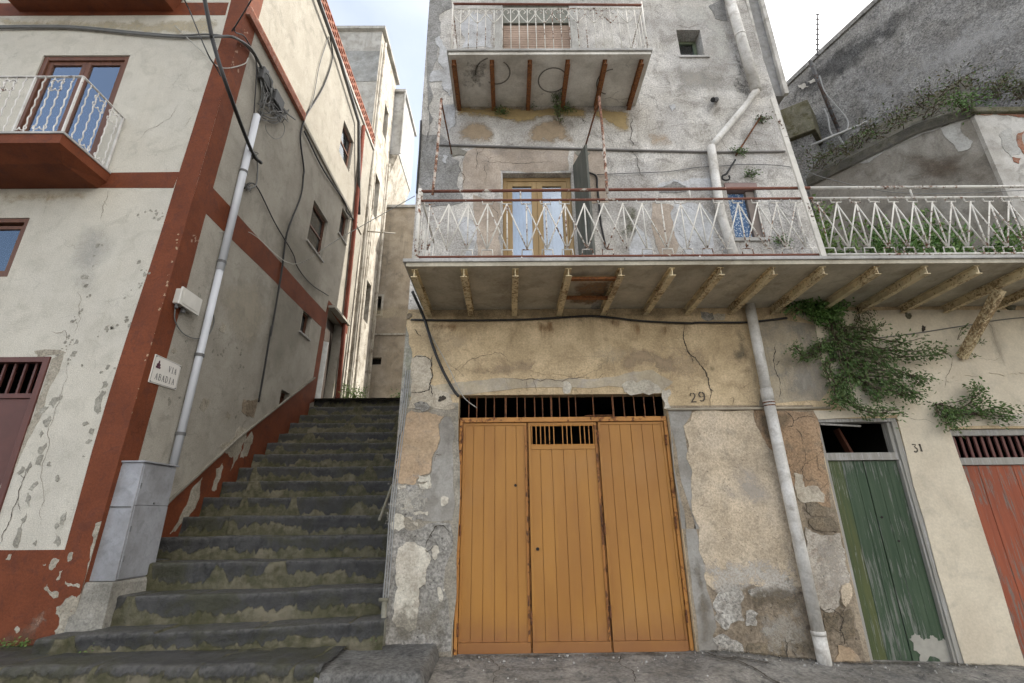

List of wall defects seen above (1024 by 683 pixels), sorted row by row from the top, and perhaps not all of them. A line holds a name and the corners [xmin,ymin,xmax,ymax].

peeling [419,0,608,256]
water stain [459,107,628,141]
peeling [940,114,1024,164]
crack [0,366,67,544]
spalling [6,243,103,560]
peeling [82,365,116,457]
peeling [170,387,258,534]
crack [412,330,605,396]
peeling [384,310,866,663]
crack [683,325,744,402]
peeling [43,512,102,634]
peeling [910,633,952,662]